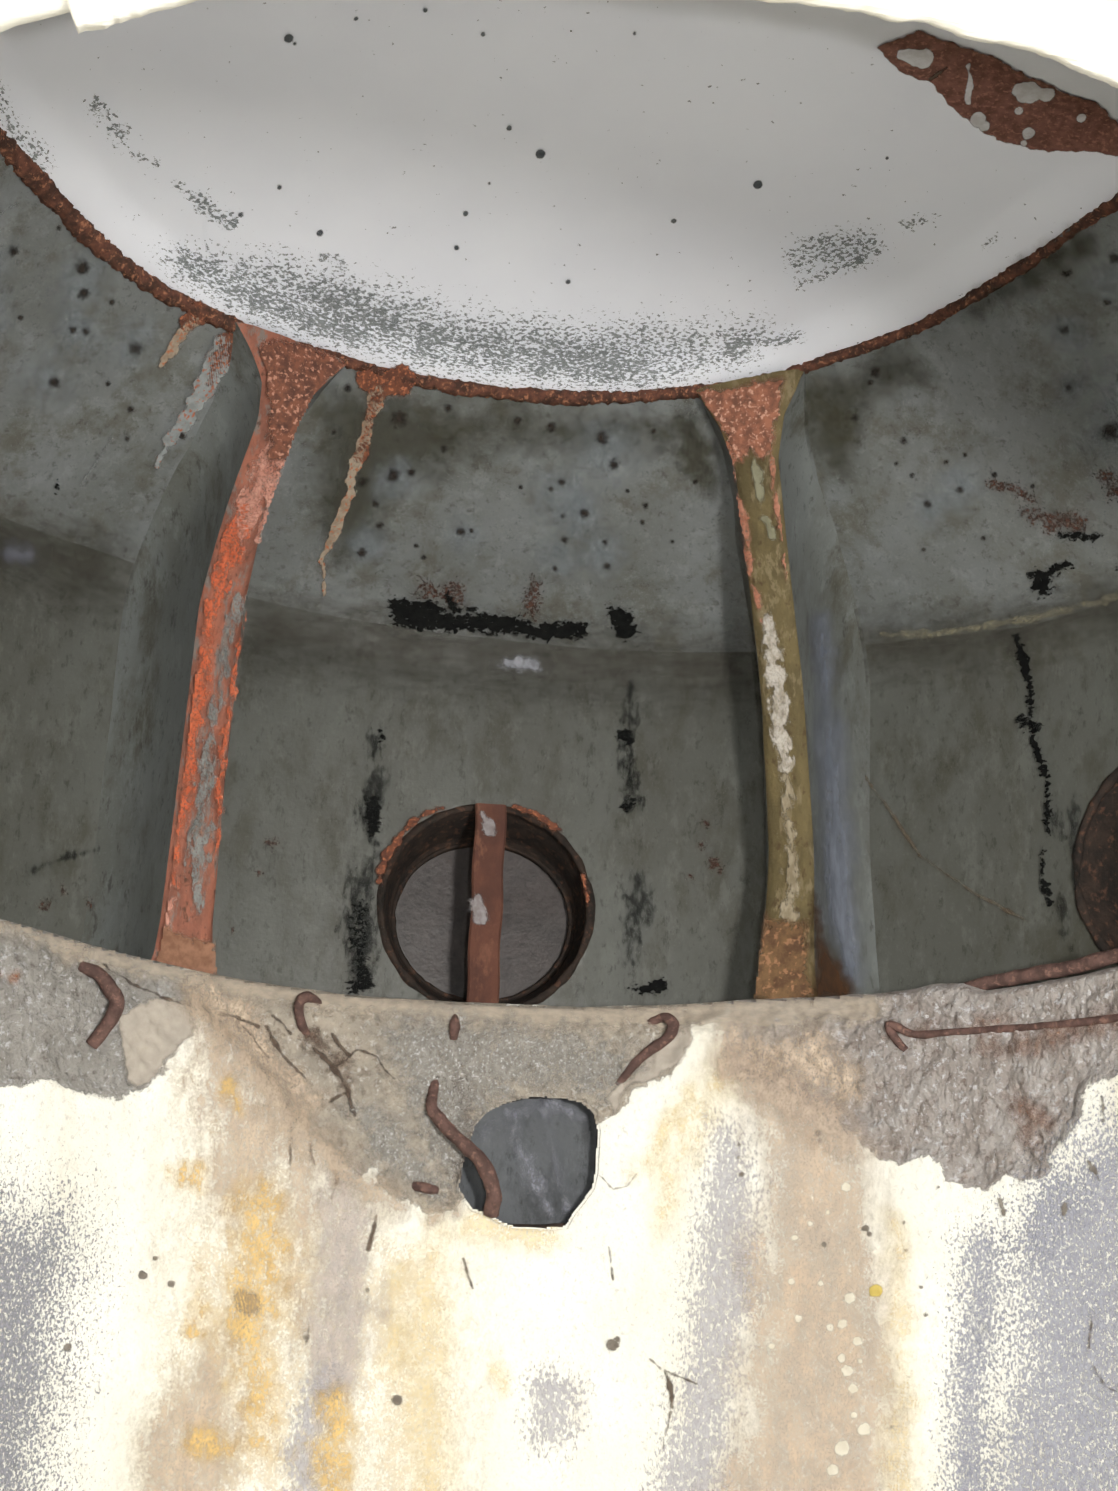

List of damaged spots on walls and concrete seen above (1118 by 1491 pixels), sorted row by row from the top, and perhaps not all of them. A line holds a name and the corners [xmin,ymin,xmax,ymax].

peeling [83,96,160,167]
rust [0,127,246,469]
peeling [152,181,805,392]
peeling [781,221,895,292]
rust [259,193,1118,596]
rust [376,806,445,884]
peeling [480,811,496,836]
rust [156,923,217,975]
peeling [470,894,487,924]
rust [754,907,853,999]
water stain [0,585,1118,1491]
spalling [0,919,1118,1218]